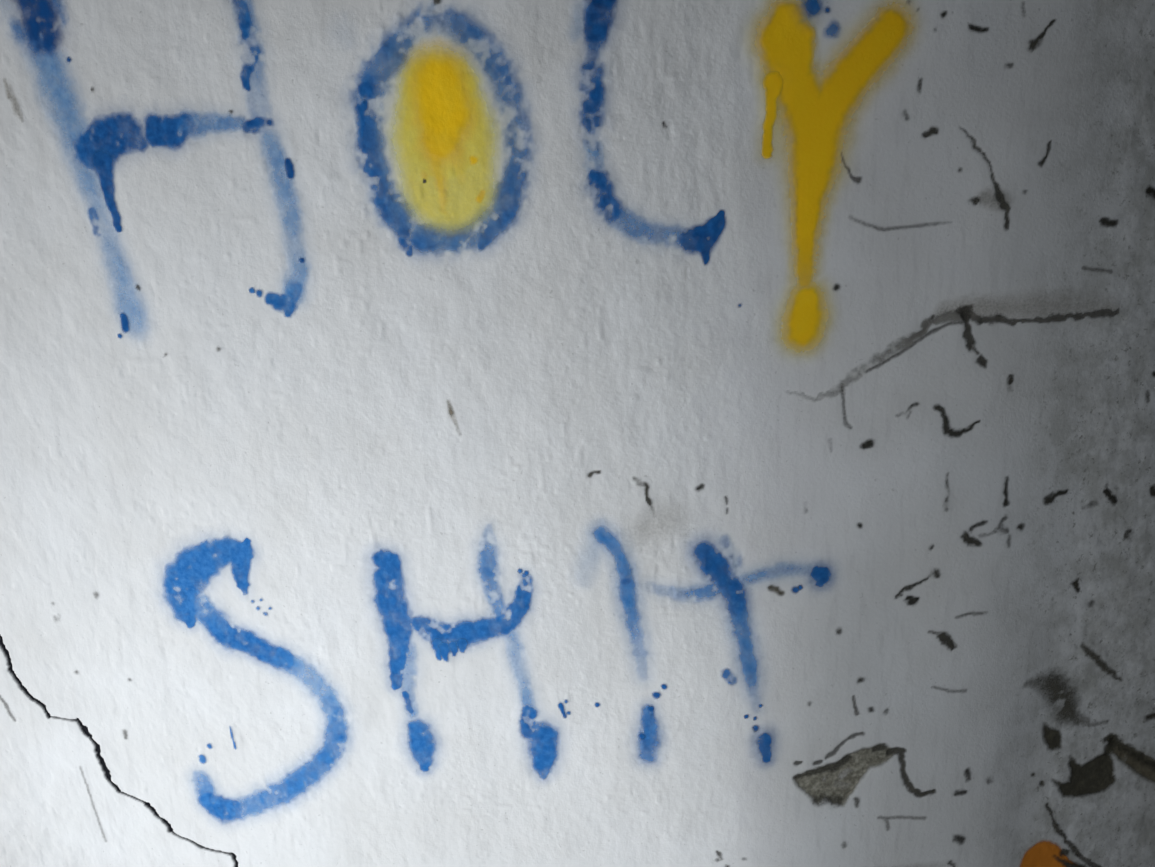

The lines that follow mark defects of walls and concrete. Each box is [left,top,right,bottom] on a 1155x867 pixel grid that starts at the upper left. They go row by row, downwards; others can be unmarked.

crack [842,306,1119,425]
peeling [1033,672,1087,750]
crack [0,635,238,867]
spalling [793,732,935,807]
peeling [1032,735,1155,797]